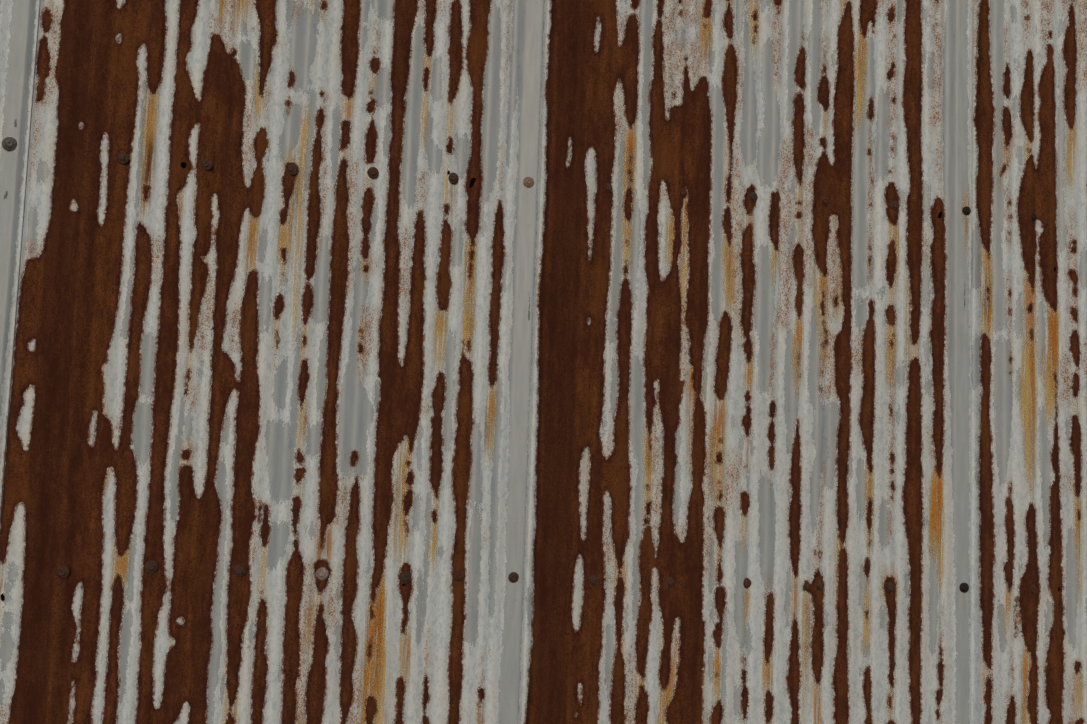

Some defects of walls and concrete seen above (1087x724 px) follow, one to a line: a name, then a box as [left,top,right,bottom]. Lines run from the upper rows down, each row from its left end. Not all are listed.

corrosion [0,0,285,724]
peeling [132,332,157,466]
peeling [265,234,331,505]
corrosion [272,0,512,724]
peeling [369,0,545,724]
peeling [602,349,645,701]
peeling [703,85,726,402]
corrosion [524,0,948,724]
peeling [753,243,891,550]
peeling [851,35,886,331]
peeling [921,0,1051,724]
corrosion [965,0,1087,724]